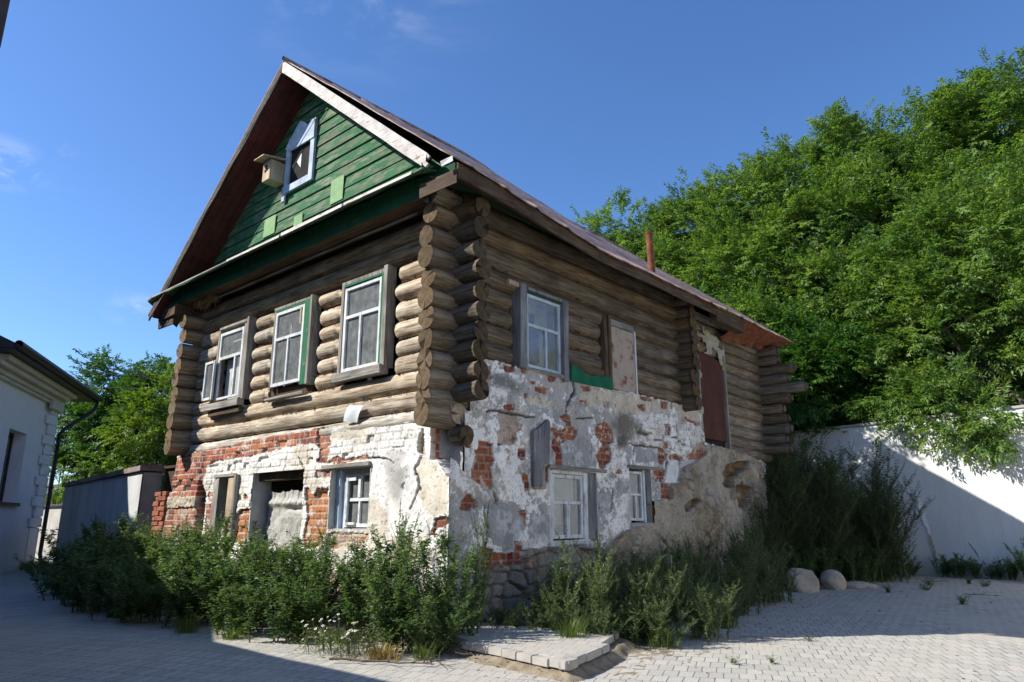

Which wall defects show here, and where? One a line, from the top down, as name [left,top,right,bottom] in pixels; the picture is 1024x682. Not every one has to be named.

spalling [162,414,414,549]
flaking render [383,363,708,573]
spalling [722,461,752,509]